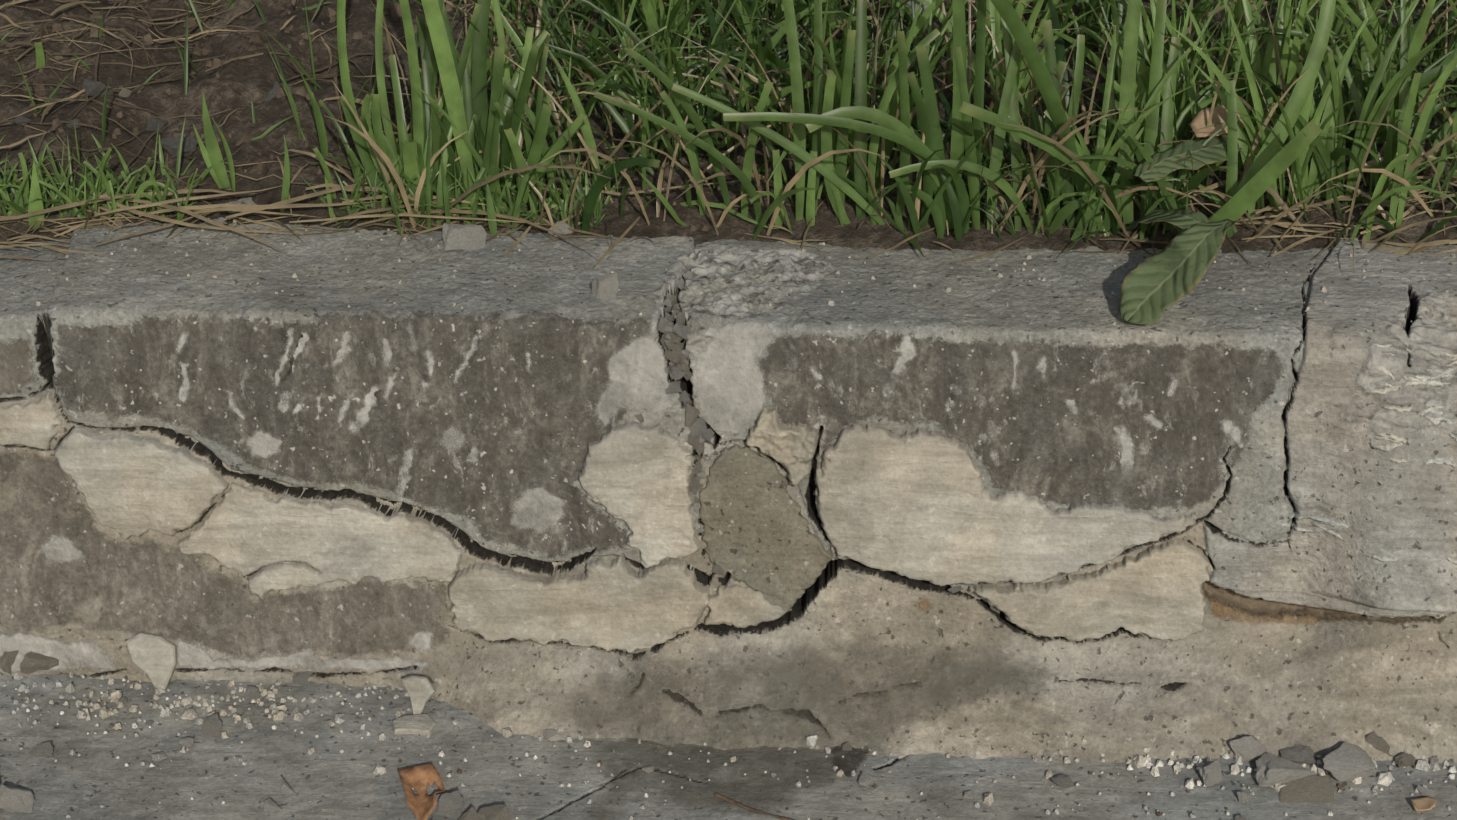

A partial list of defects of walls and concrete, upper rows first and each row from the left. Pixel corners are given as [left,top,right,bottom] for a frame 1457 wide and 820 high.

crack [0,382,50,401]
leakage [0,453,448,658]
crack [5,422,596,575]
peeling [0,245,1210,653]
crack [449,250,1152,732]
crack [1082,267,1314,569]
crack [1403,286,1418,367]
crack [1059,678,1186,691]